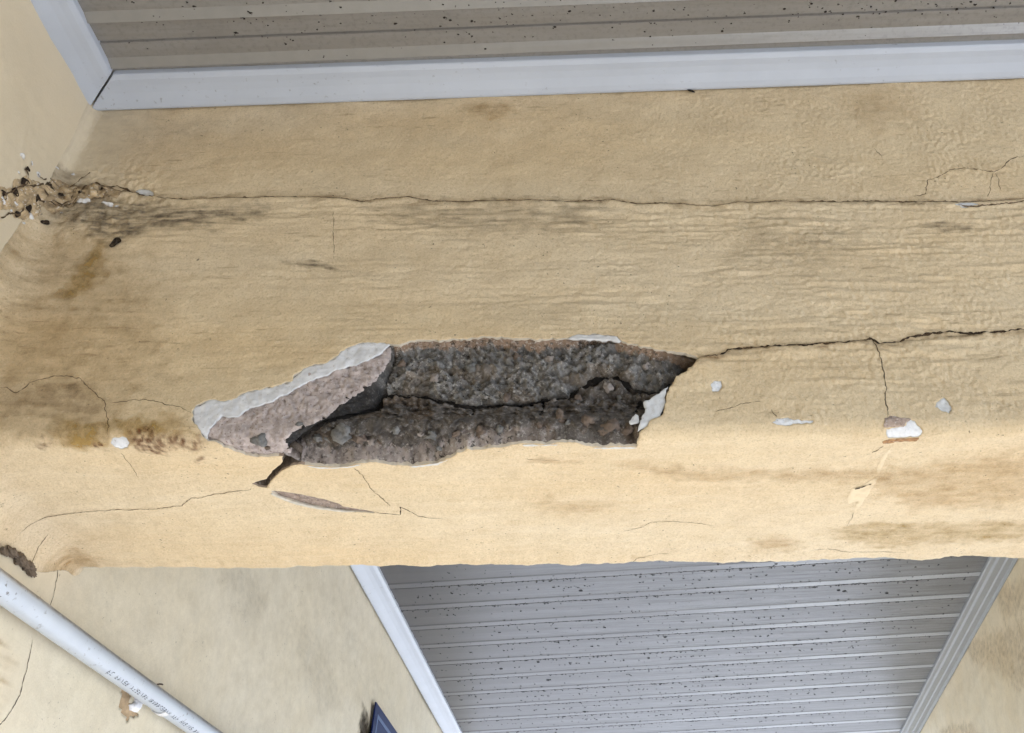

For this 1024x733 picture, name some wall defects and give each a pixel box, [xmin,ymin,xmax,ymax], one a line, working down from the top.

spalling [0,153,154,225]
water stain [82,197,205,238]
crack [325,156,1024,259]
water stain [67,423,97,448]
crack [1,375,189,430]
spalling [193,334,696,469]
crack [705,328,1024,417]
peeling [882,416,922,444]
crack [24,441,443,562]